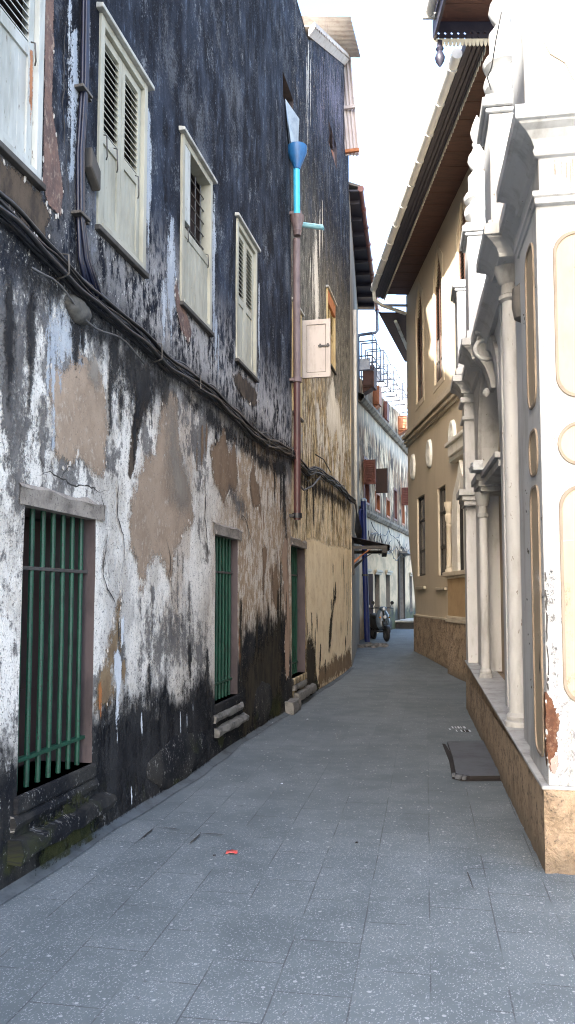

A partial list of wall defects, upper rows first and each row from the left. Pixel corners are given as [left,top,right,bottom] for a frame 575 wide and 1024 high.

peeling [0,0,64,242]
peeling [45,347,110,479]
crack [42,462,125,640]
damp [92,556,214,831]
peeling [127,391,260,593]
damp [238,566,287,738]